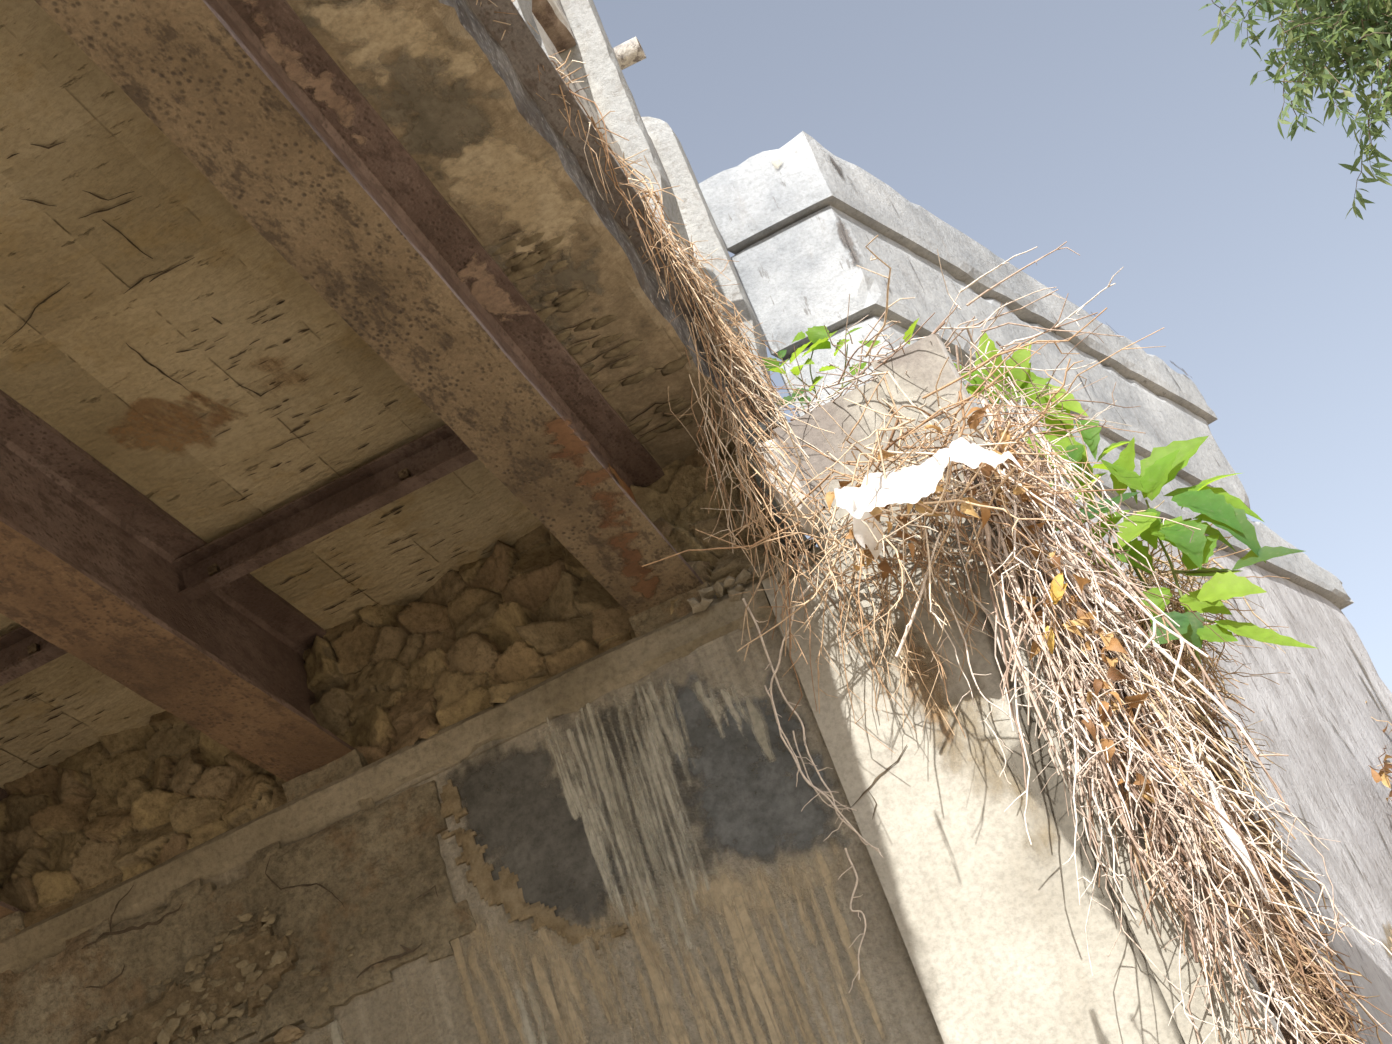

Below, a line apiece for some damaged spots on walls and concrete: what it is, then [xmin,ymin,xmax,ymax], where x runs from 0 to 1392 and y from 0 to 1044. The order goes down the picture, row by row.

peeling [242,0,366,145]
peeling [304,0,483,85]
damp [356,52,505,177]
crack [82,885,182,989]
spalling [81,906,329,1044]
crack [265,856,344,906]
crack [357,943,422,978]
peeling [440,779,629,950]
damp [448,672,885,1044]